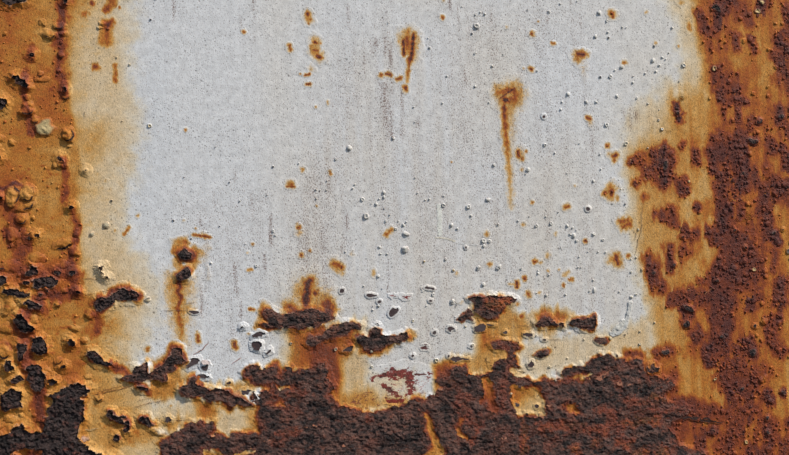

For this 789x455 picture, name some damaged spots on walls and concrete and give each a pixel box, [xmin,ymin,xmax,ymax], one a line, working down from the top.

rust [284,6,330,88]
rust [376,20,427,96]
rust [0,0,249,455]
rust [413,0,789,455]
rust [271,333,310,367]
rust [322,339,377,390]
peeling [0,259,714,455]